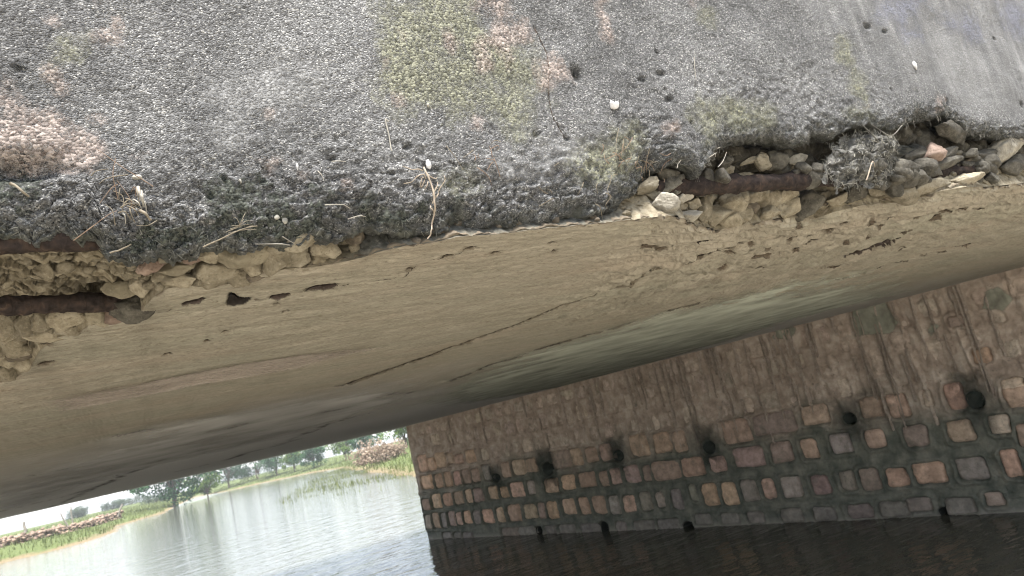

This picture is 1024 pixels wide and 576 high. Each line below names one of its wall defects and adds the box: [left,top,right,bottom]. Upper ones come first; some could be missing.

leakage [491,1,528,51]
spalling [0,120,1024,382]